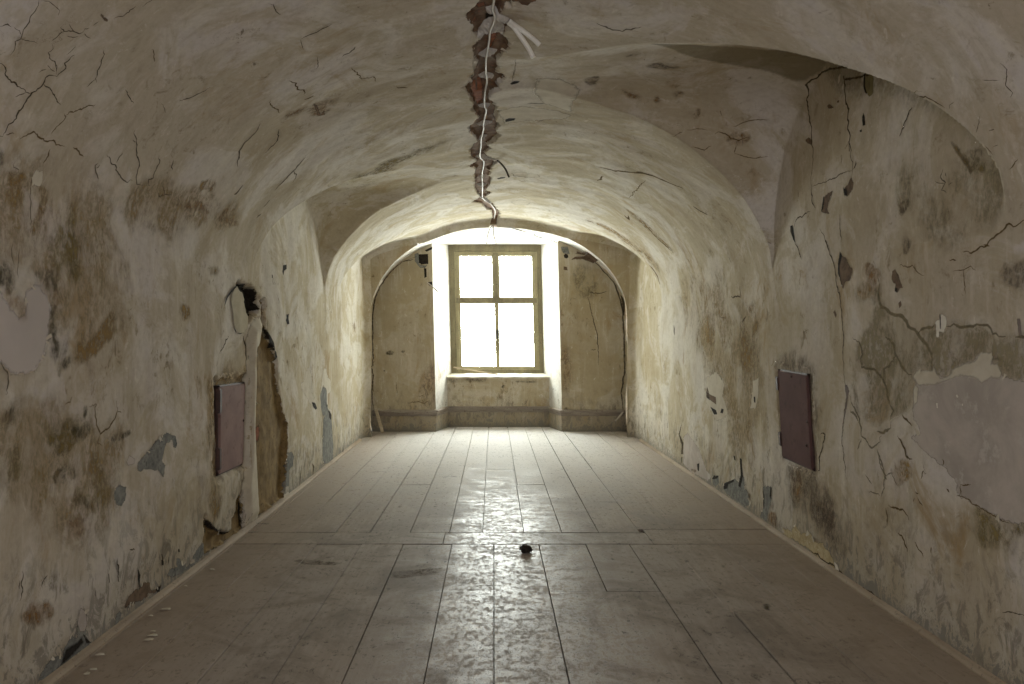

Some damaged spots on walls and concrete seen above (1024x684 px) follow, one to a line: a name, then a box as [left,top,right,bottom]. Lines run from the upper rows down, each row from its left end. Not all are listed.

crack [0,0,174,277]
flaking render [465,0,536,227]
peeling [0,285,52,374]
water stain [126,180,213,233]
crack [794,66,944,555]
crack [950,220,1024,290]
water stain [1,403,130,534]
peeling [127,433,177,477]
flaking render [225,284,295,515]
peeling [312,368,336,464]
peeling [681,433,776,526]
peeling [911,352,1024,524]